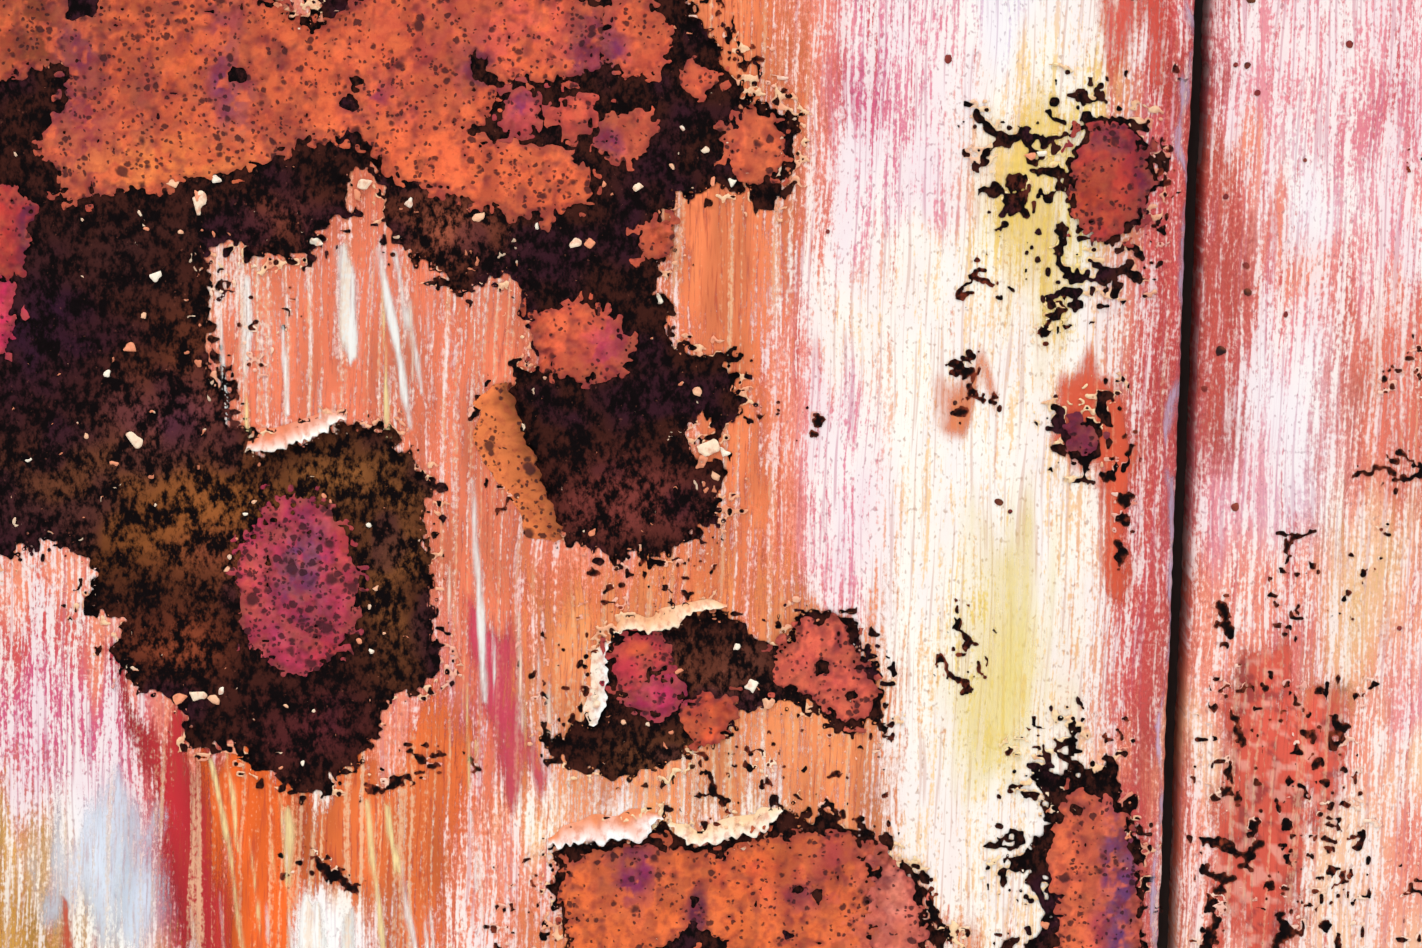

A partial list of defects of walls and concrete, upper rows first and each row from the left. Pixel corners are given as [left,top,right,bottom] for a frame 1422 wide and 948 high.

rust [0,0,980,948]
rust [944,360,992,434]
rust [958,0,1187,331]
rust [1033,321,1175,601]
rust [1195,140,1253,477]
rust [980,513,1168,948]
rust [1206,632,1354,948]